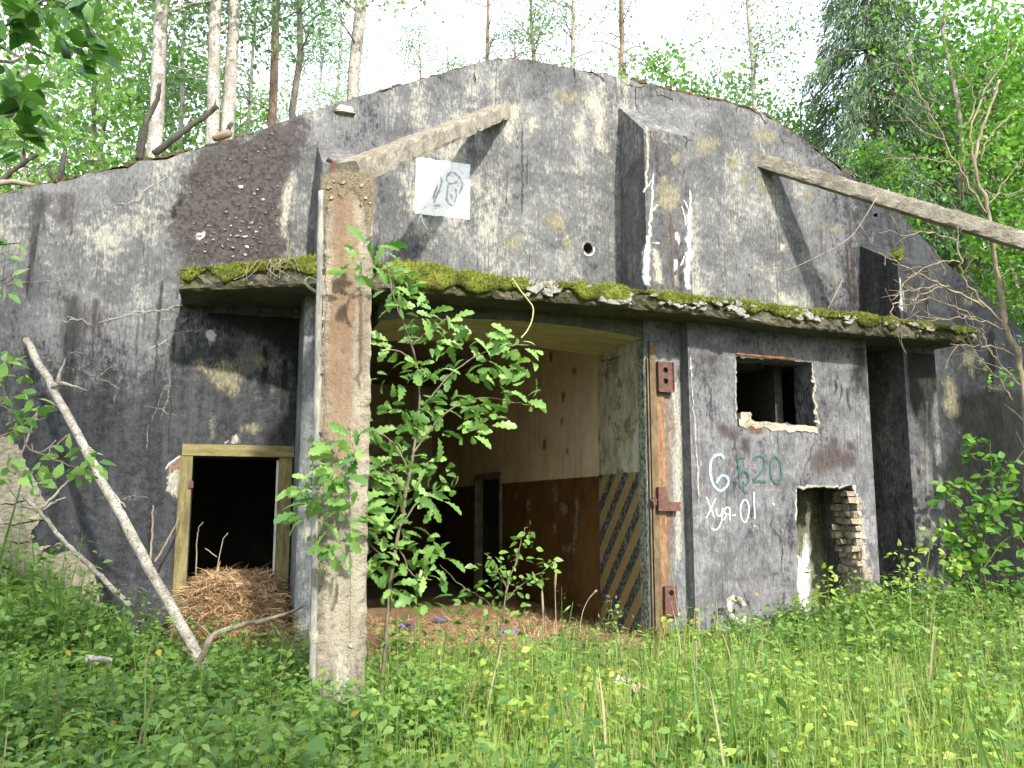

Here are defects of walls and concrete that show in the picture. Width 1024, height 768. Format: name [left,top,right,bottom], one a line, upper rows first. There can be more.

damp [643,174,692,289]
spalling [811,363,820,424]
spalling [795,484,875,592]